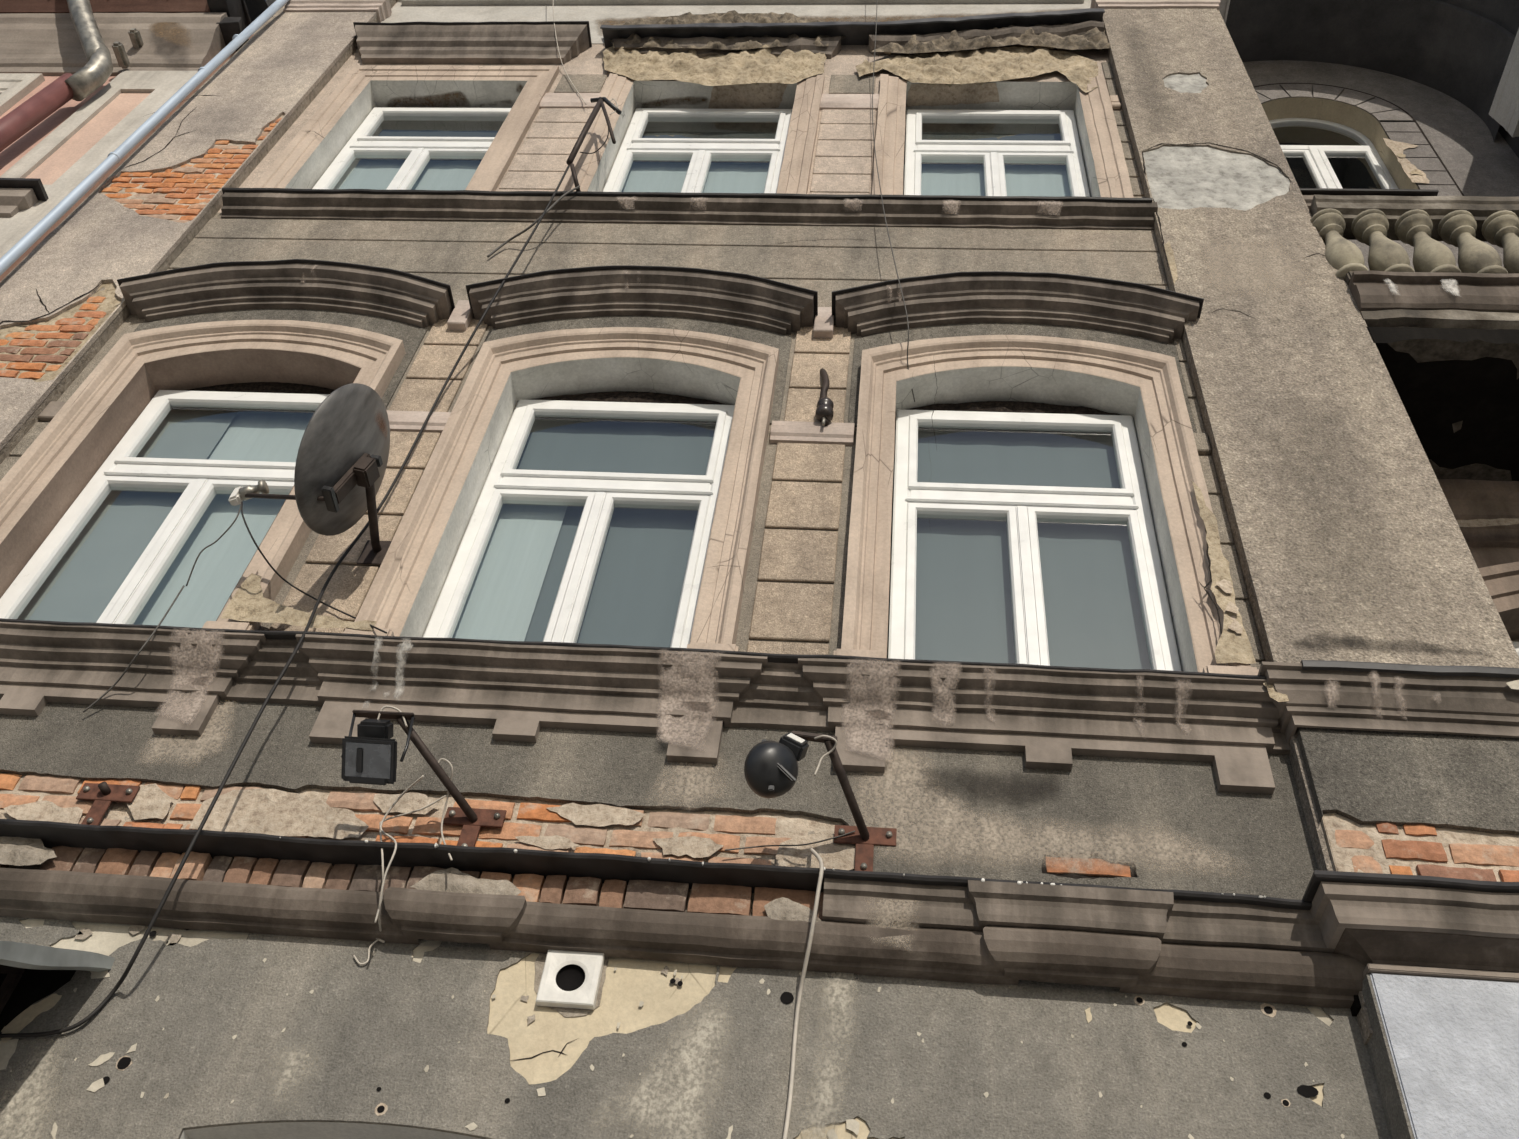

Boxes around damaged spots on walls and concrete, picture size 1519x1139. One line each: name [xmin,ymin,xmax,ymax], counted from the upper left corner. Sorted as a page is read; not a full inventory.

spalling [602,10,846,109]
spalling [855,23,1110,107]
spalling [101,115,284,223]
spalling [0,282,122,382]
flaking render [1428,459,1512,481]
flaking render [1456,518,1519,527]
spalling [1192,481,1256,664]
spalling [1263,682,1289,702]
spalling [0,773,856,870]
spalling [1323,813,1519,882]
flaking render [487,952,737,1096]
flaking render [795,1117,905,1139]